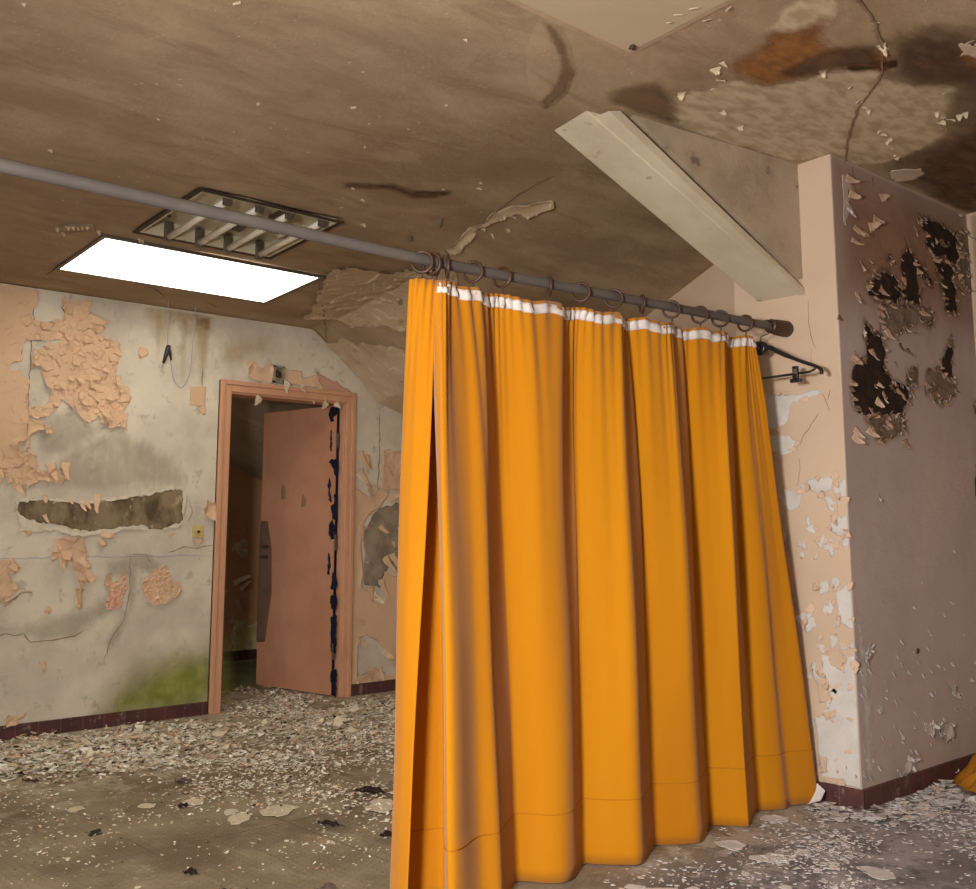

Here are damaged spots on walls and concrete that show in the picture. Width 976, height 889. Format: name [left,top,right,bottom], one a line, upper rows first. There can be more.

peeling [768,0,838,34]
corrosion [734,25,882,84]
peeling [674,61,968,245]
crack [845,0,884,186]
water stain [900,36,976,207]
peeling [958,40,976,58]
peeling [0,285,187,610]
peeling [303,200,555,415]
peeling [764,390,820,459]
spalling [849,214,975,450]
peeling [351,449,401,684]
peeling [778,471,861,804]